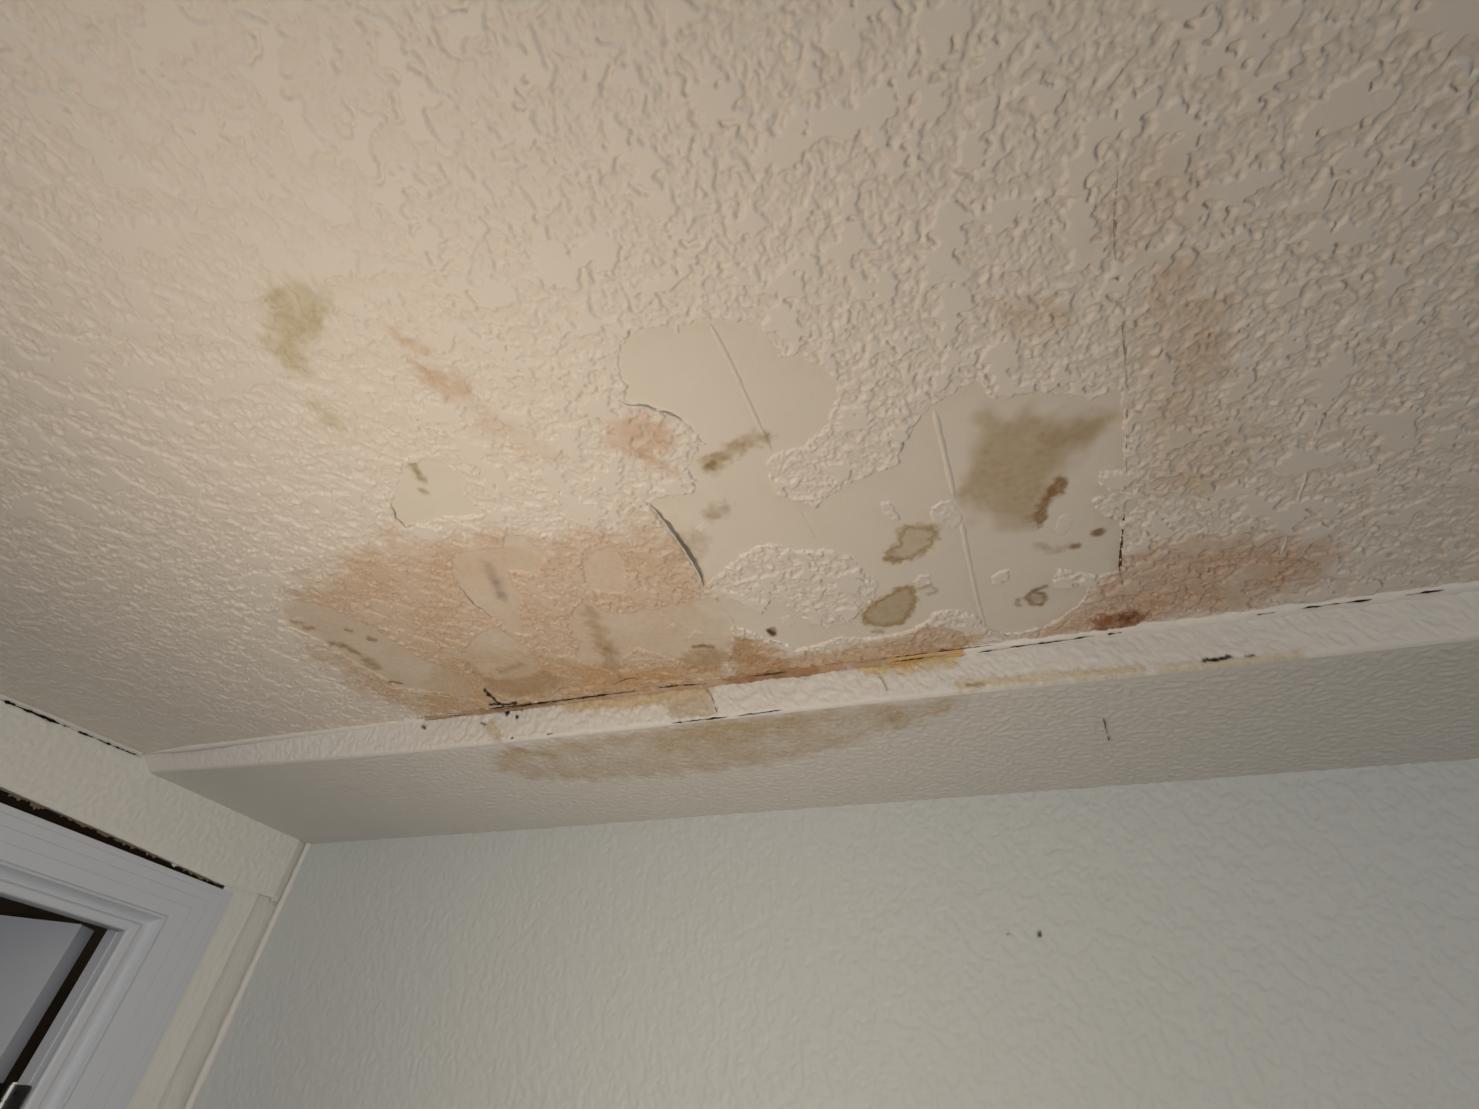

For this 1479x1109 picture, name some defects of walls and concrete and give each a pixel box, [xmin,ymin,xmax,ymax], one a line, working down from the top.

peeling [567,317,1126,672]
water stain [1035,478,1067,524]
water stain [863,586,915,627]
water stain [735,629,789,675]
water stain [426,655,752,739]